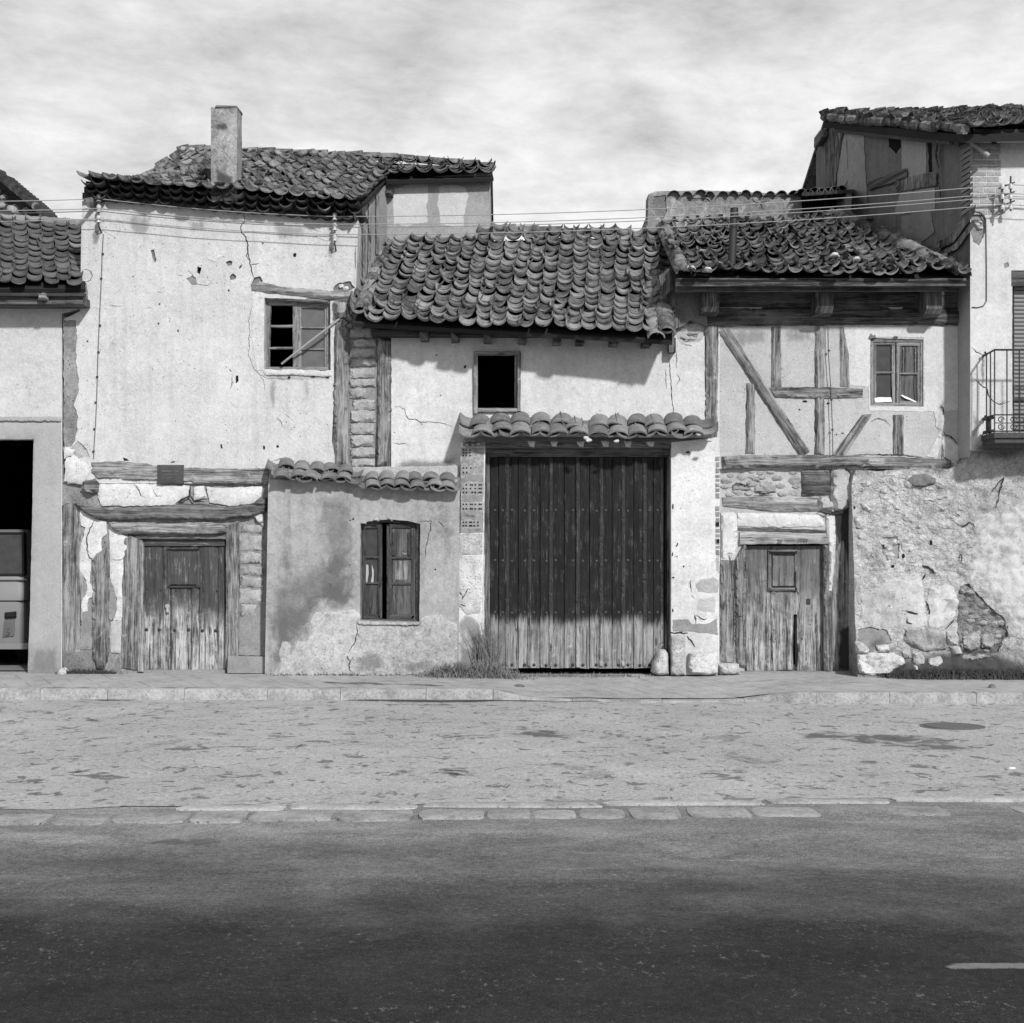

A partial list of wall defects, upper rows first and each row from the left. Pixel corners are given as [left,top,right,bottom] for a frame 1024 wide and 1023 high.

crack [239,213,258,280]
peeling [79,510,127,653]
spalling [858,627,891,651]
spalling [927,584,1008,654]